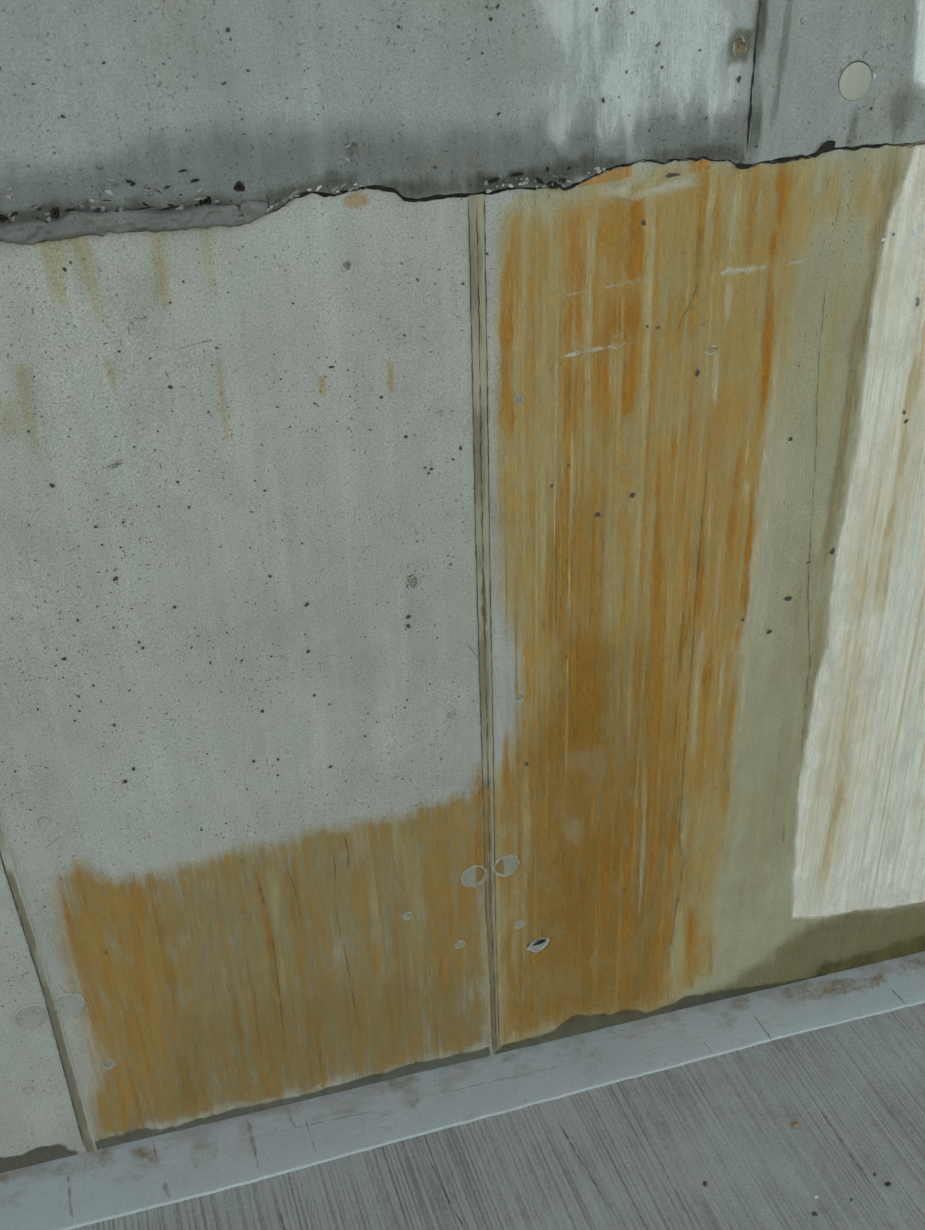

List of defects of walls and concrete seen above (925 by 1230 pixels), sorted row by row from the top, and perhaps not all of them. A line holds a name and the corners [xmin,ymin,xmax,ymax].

spalling [126,180,182,210]
spalling [195,182,245,207]
crack [240,141,925,226]
spalling [34,207,74,219]
corrosion [476,859,504,883]